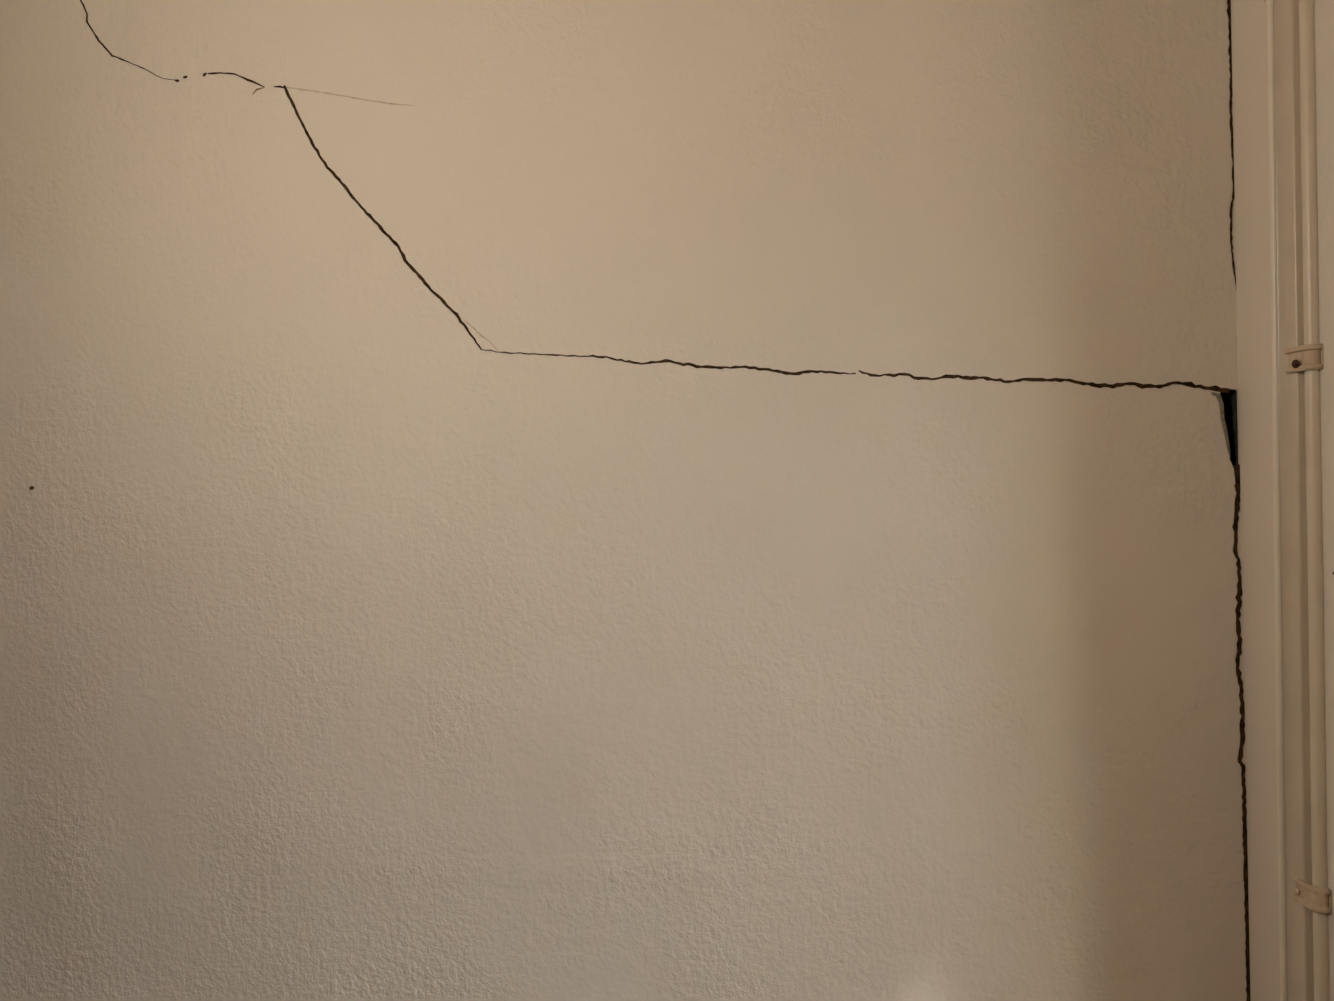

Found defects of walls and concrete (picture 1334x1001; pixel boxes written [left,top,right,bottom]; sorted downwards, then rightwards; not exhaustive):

crack [78,0,1230,393]
crack [1227,0,1236,284]
crack [1232,465,1250,1001]